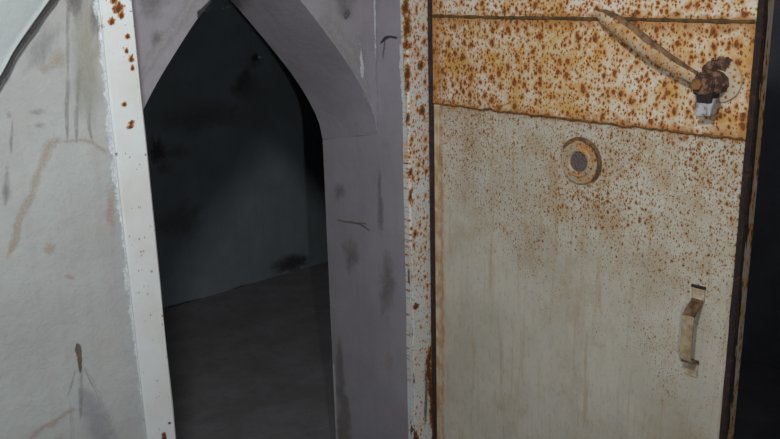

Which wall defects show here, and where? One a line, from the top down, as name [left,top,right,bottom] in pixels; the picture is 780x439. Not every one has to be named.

rust [108,0,125,25]
rust [401,0,412,50]
rust [404,0,768,439]